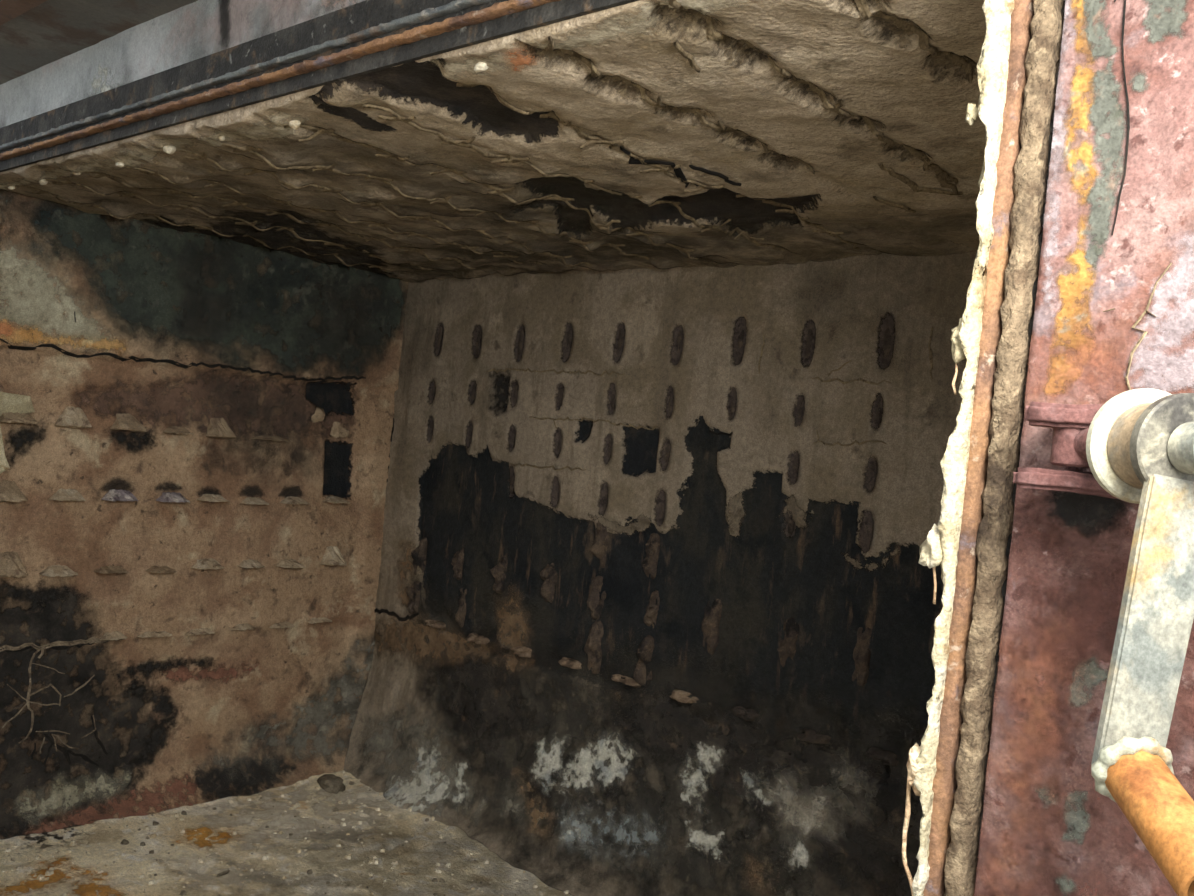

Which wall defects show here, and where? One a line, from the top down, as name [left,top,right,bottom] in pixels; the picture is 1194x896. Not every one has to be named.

spalling [309,58,560,143]
corrosion [1044,0,1125,395]
damp [0,247,114,342]
crack [0,338,366,382]
peeling [374,0,1015,896]
corrosion [1184,619,1194,662]
crack [0,636,110,767]
efflorescence [531,737,633,793]
efflorescence [681,742,724,802]
corrosion [979,527,1178,896]
corrosion [1166,685,1194,779]
efflorescence [685,822,724,859]